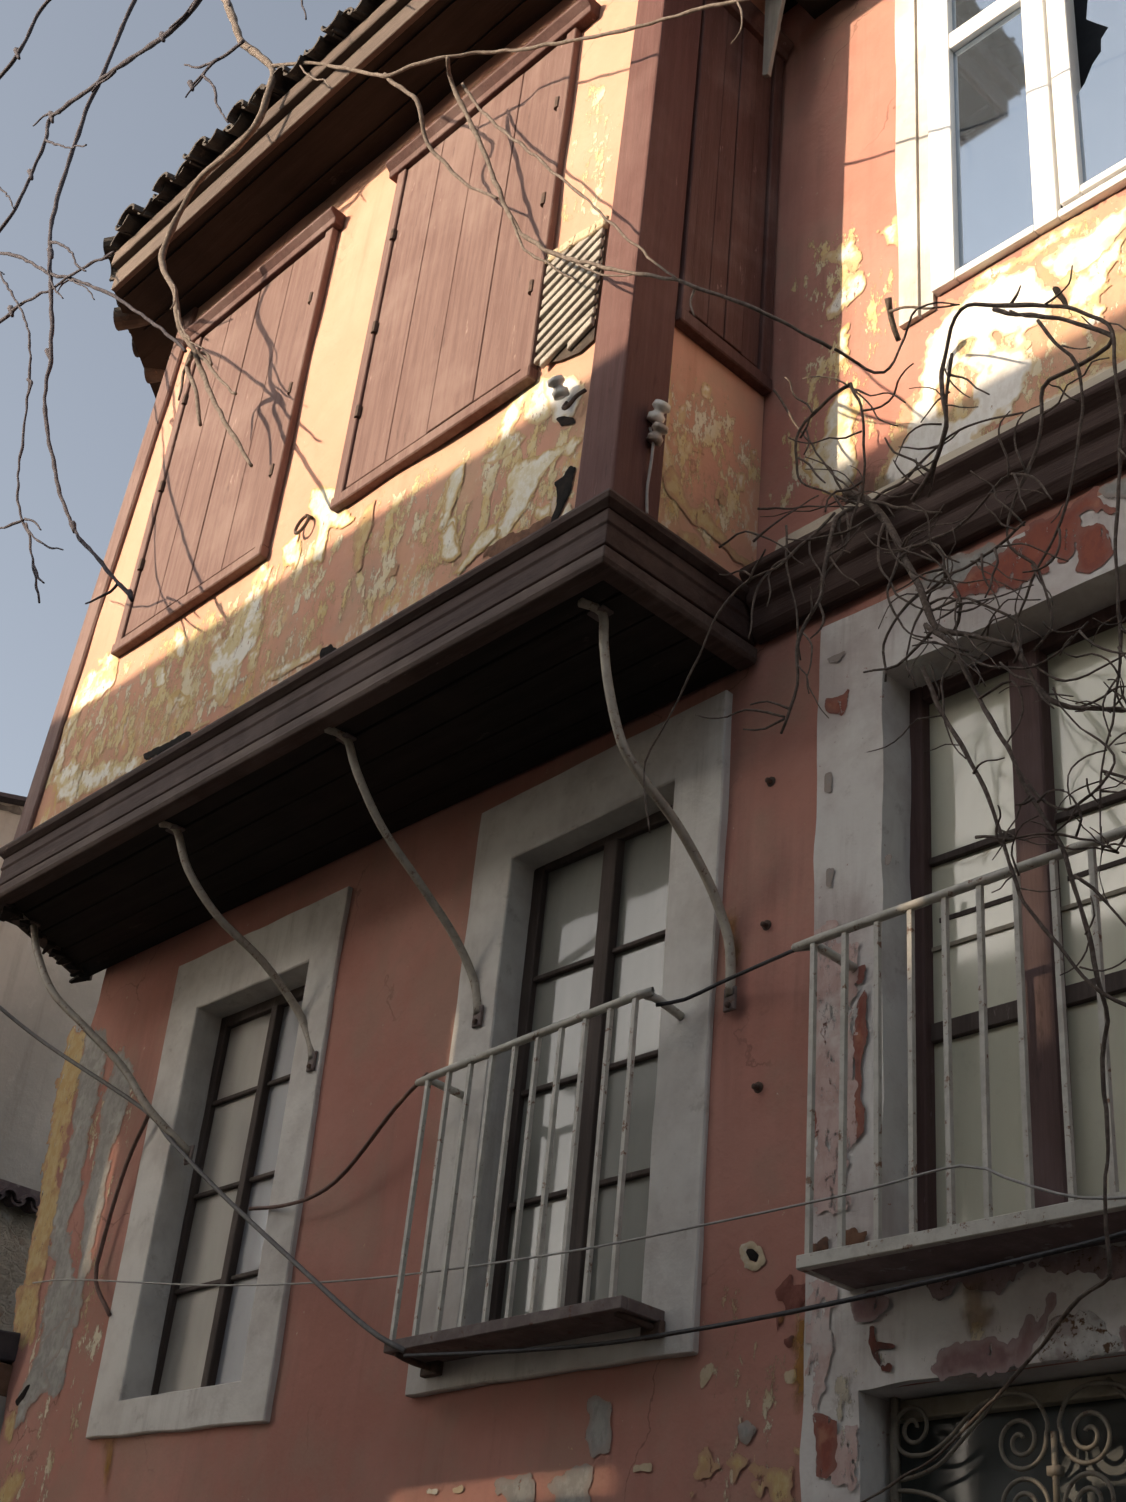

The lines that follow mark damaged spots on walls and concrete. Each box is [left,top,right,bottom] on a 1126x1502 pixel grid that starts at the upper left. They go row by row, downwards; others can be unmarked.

peeling [661,193,1126,566]
peeling [45,74,617,806]
peeling [952,486,1116,602]
peeling [0,1025,113,1502]
peeling [926,1245,1126,1301]
peeling [930,1292,1126,1381]
peeling [426,1485,463,1494]